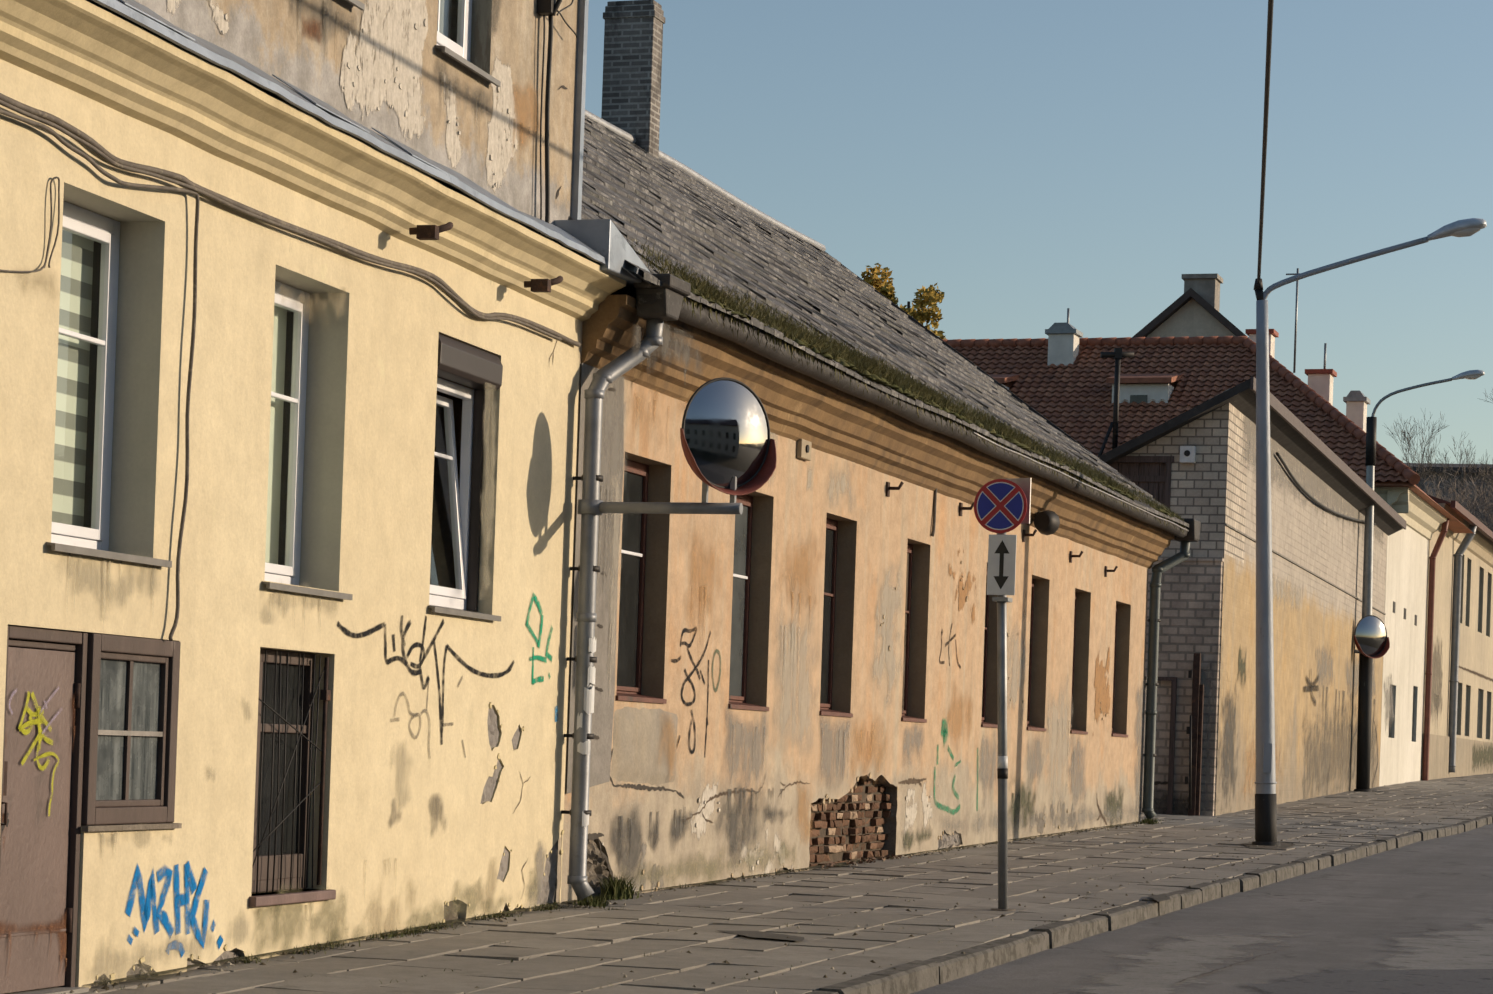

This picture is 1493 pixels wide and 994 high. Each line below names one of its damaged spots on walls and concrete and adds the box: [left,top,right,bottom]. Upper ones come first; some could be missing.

peeling [210,0,229,35]
peeling [340,0,428,141]
peeling [443,73,462,168]
peeling [486,57,518,193]
damp [1238,650,1246,681]
flaking render [480,702,525,804]
damp [1304,651,1394,792]
flaking render [497,846,512,883]
flaking render [500,830,564,915]
flaking render [586,839,663,897]
damp [611,809,687,873]
flaking render [728,772,963,880]